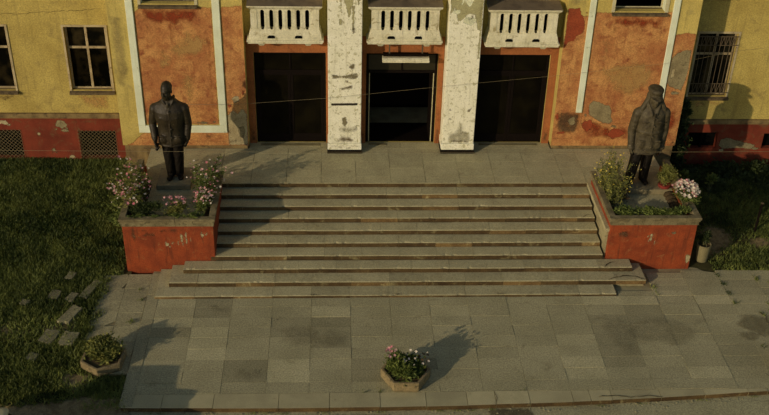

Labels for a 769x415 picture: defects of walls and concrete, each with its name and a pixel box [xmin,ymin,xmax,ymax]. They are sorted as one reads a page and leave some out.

flaking render [339,0,360,33]
flaking render [450,0,484,59]
flaking render [667,50,691,95]
flaking render [227,91,255,145]
damp [555,113,579,134]
flaking render [582,101,625,139]
peeling [719,138,758,151]